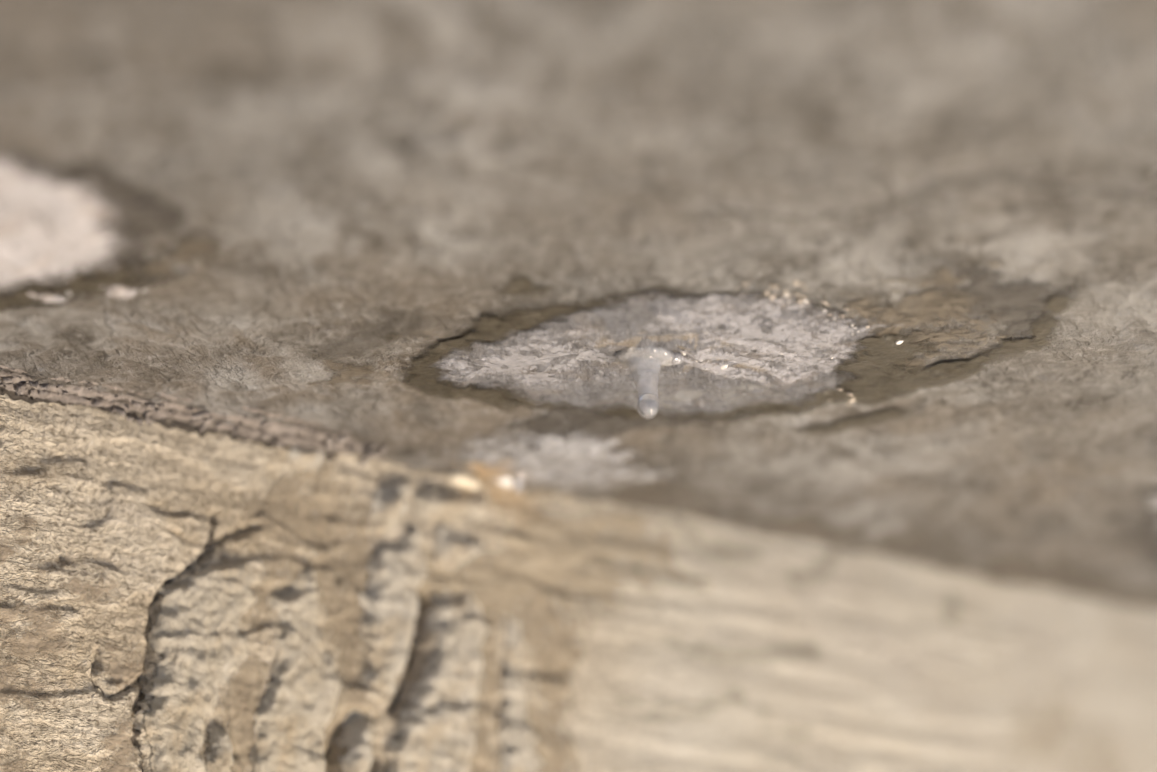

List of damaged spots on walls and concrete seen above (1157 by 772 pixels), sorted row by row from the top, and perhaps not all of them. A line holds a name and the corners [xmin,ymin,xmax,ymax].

water stain [0,155,227,311]
crack [91,523,251,771]
water stain [201,462,386,772]
water stain [309,262,1157,772]